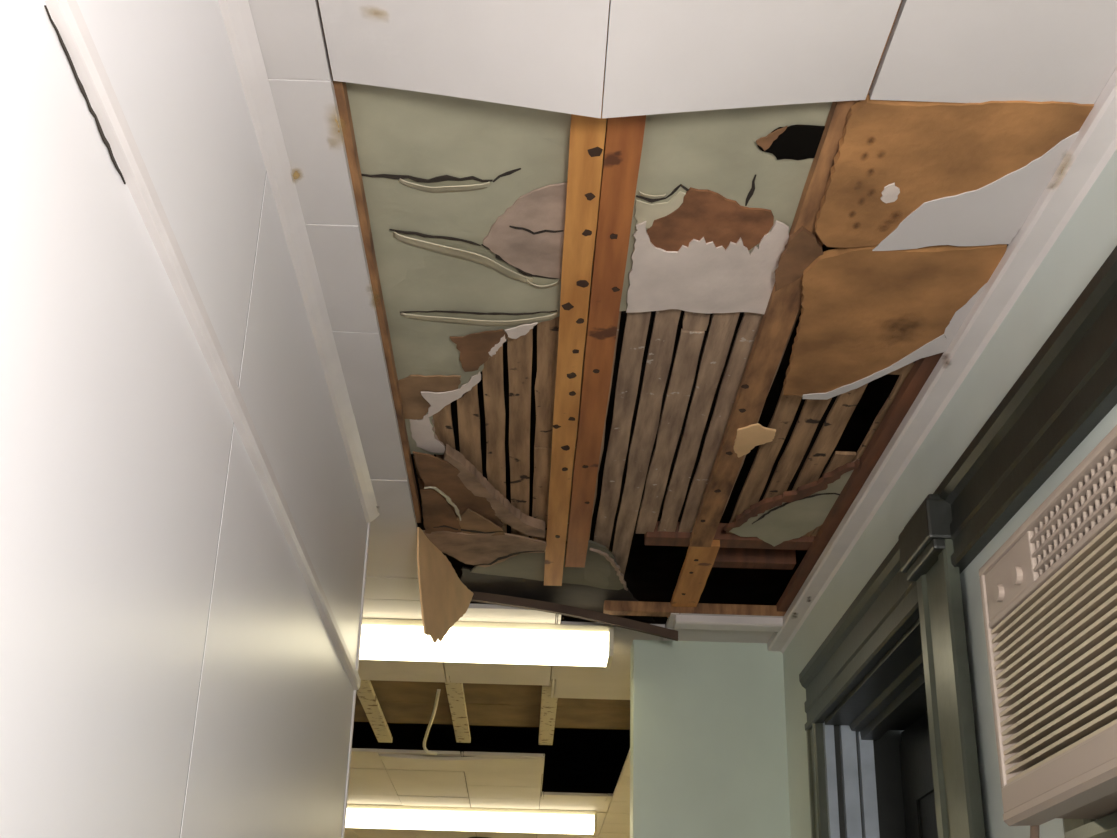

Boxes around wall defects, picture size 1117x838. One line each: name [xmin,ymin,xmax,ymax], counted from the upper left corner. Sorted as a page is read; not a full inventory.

crack [44,5,126,184]
crack [361,168,521,193]
spalling [756,125,825,160]
crack [389,229,559,326]
peeling [483,182,567,279]
crack [509,226,564,235]
peeling [626,187,823,314]
spalling [398,322,547,567]
peeling [734,423,776,457]
spalling [724,459,860,532]